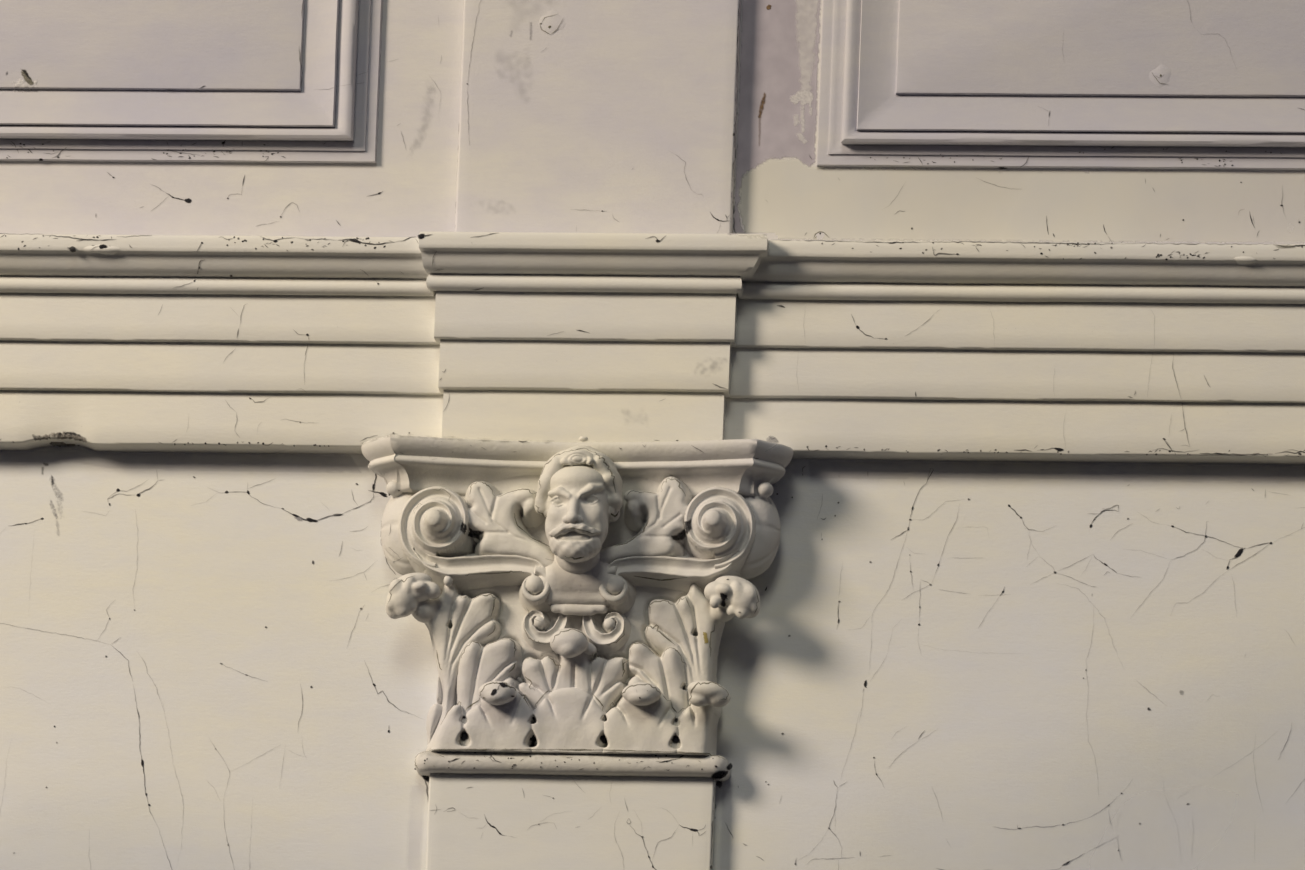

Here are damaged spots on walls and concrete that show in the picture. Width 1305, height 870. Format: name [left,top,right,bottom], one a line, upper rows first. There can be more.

peeling [733,0,820,233]
crack [225,474,387,522]
crack [1171,525,1272,569]
crack [137,710,151,813]
crack [637,755,732,777]
crack [630,821,733,870]